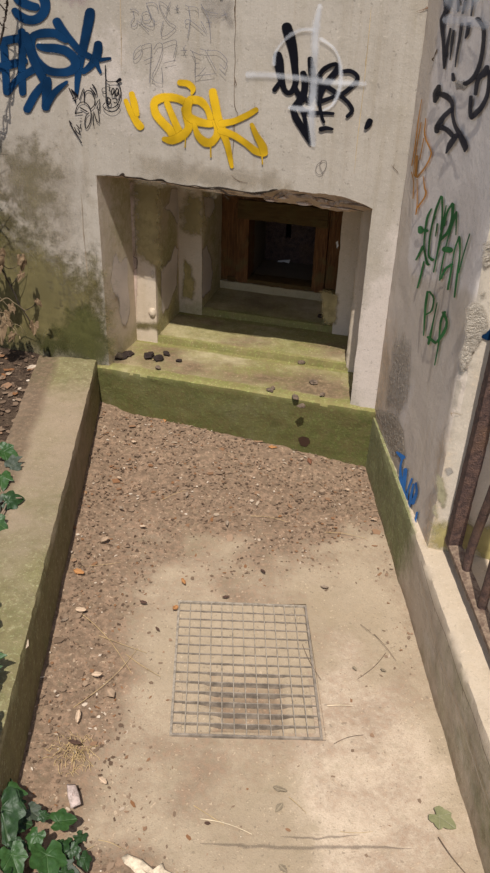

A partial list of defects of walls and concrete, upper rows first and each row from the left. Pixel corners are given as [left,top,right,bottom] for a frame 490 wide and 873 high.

leakage [0,147,60,241]
spalling [108,176,372,325]
spalling [460,293,488,370]